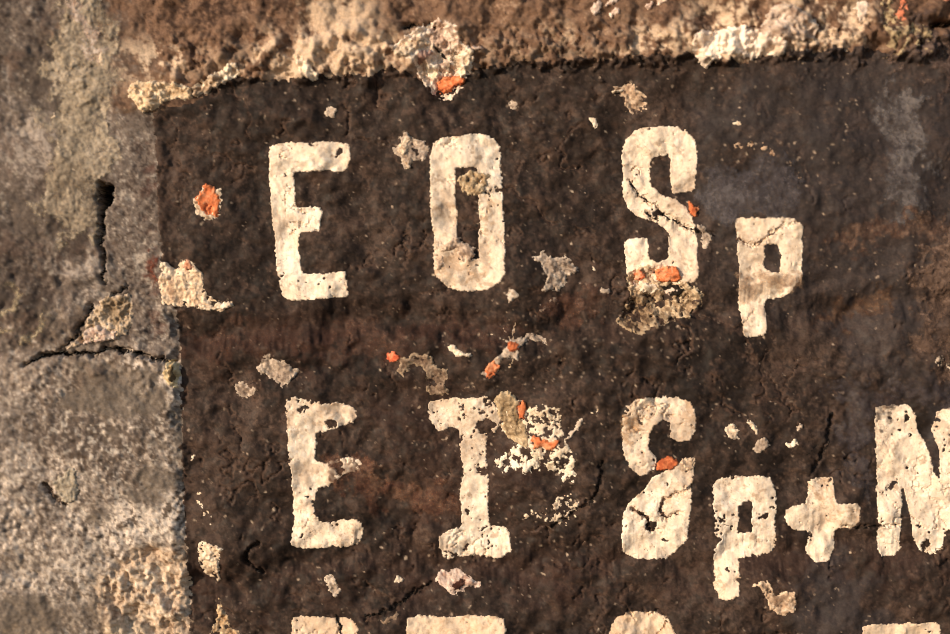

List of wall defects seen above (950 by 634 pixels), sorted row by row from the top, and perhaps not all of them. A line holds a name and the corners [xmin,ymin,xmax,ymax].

spalling [895,0,908,21]
spalling [390,18,483,102]
crack [26,229,171,365]
spalling [158,259,234,312]
spalling [532,250,578,312]
spalling [616,264,704,335]
peeling [493,390,598,526]
spalling [211,598,240,634]